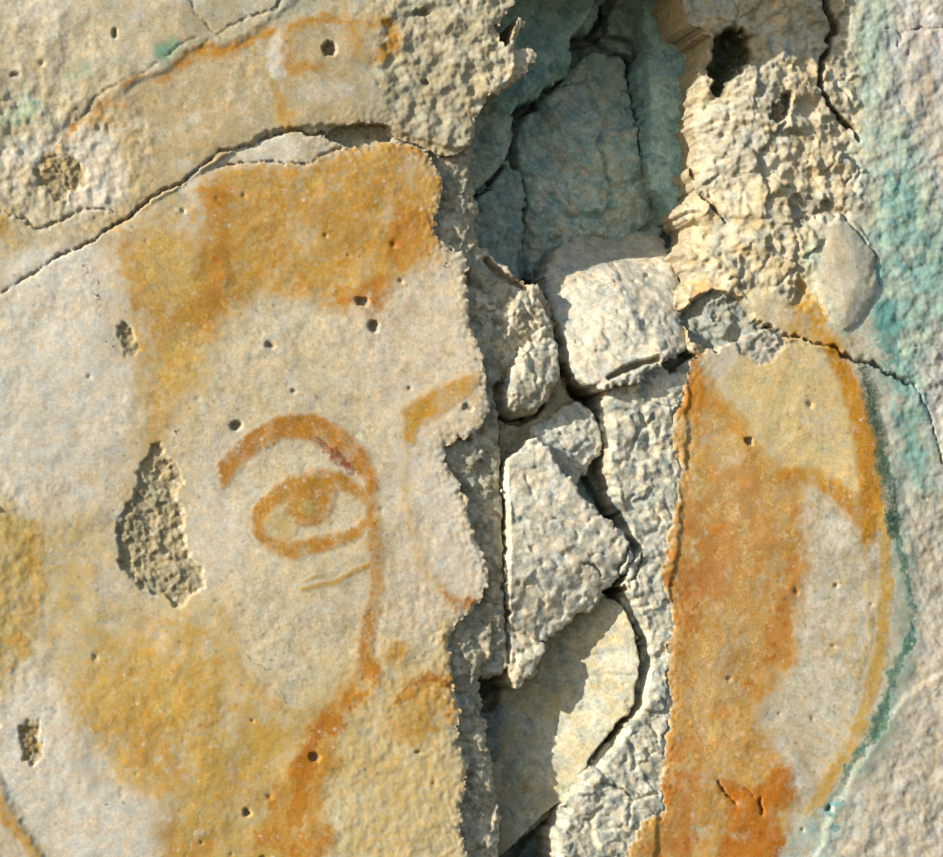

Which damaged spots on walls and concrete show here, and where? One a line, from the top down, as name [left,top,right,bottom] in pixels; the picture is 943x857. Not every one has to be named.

crack [510,12,627,127]
crack [817,0,858,141]
crack [884,25,943,48]
crack [844,168,858,185]
spalling [461,401,474,413]
crack [764,326,943,465]
spalling [114,442,206,608]
crack [0,125,692,857]
spalling [17,717,46,767]